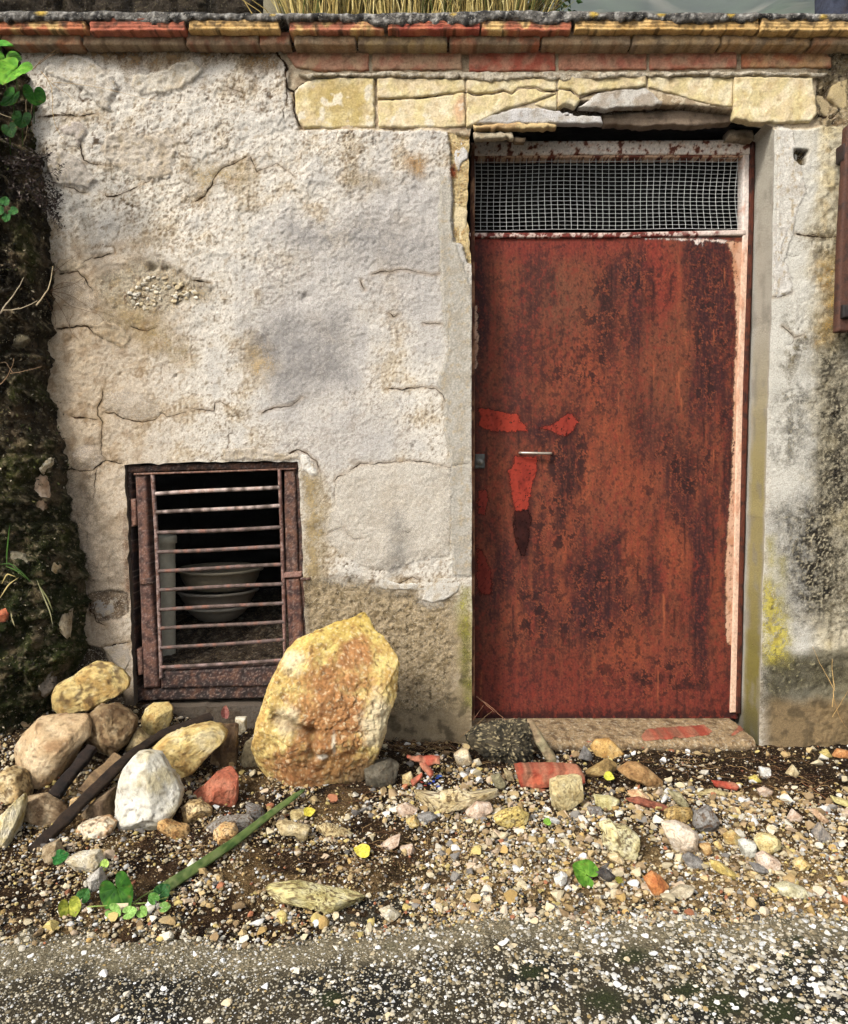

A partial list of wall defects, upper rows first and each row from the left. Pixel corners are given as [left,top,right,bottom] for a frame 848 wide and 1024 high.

crack [195,157,292,202]
crack [60,253,111,291]
crack [56,322,110,342]
flaking render [304,88,754,712]
crack [68,390,297,505]
corrosion [513,509,532,556]